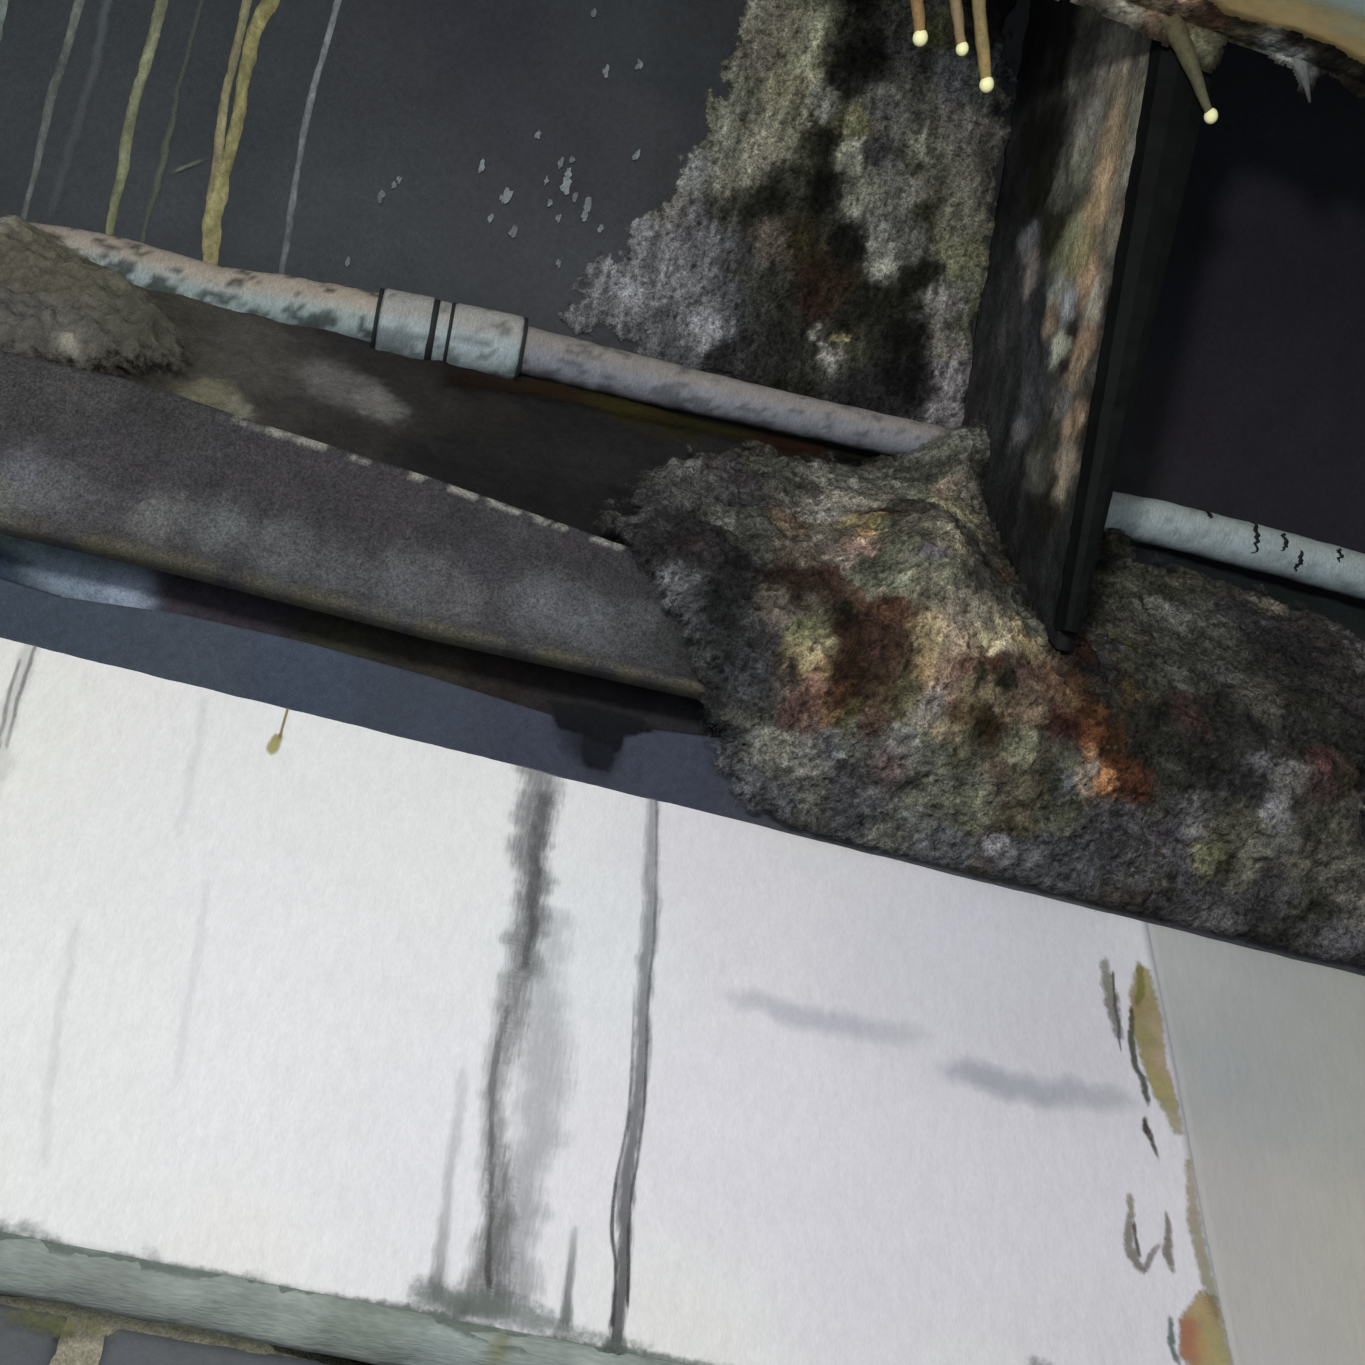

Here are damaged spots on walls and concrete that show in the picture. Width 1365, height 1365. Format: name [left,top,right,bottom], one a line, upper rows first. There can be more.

water stain [105,0,168,235]
water stain [140,0,280,265]
water stain [279,0,342,275]
water stain [557,0,1018,428]
water stain [1056,0,1365,99]
crack [1250,522,1304,571]
corrosion [592,416,1365,967]
water stain [506,766,555,1002]
water stain [335,817,697,1365]
peeling [1102,961,1158,1156]
peeling [1124,1195,1174,1271]
peeling [1168,1318,1180,1364]